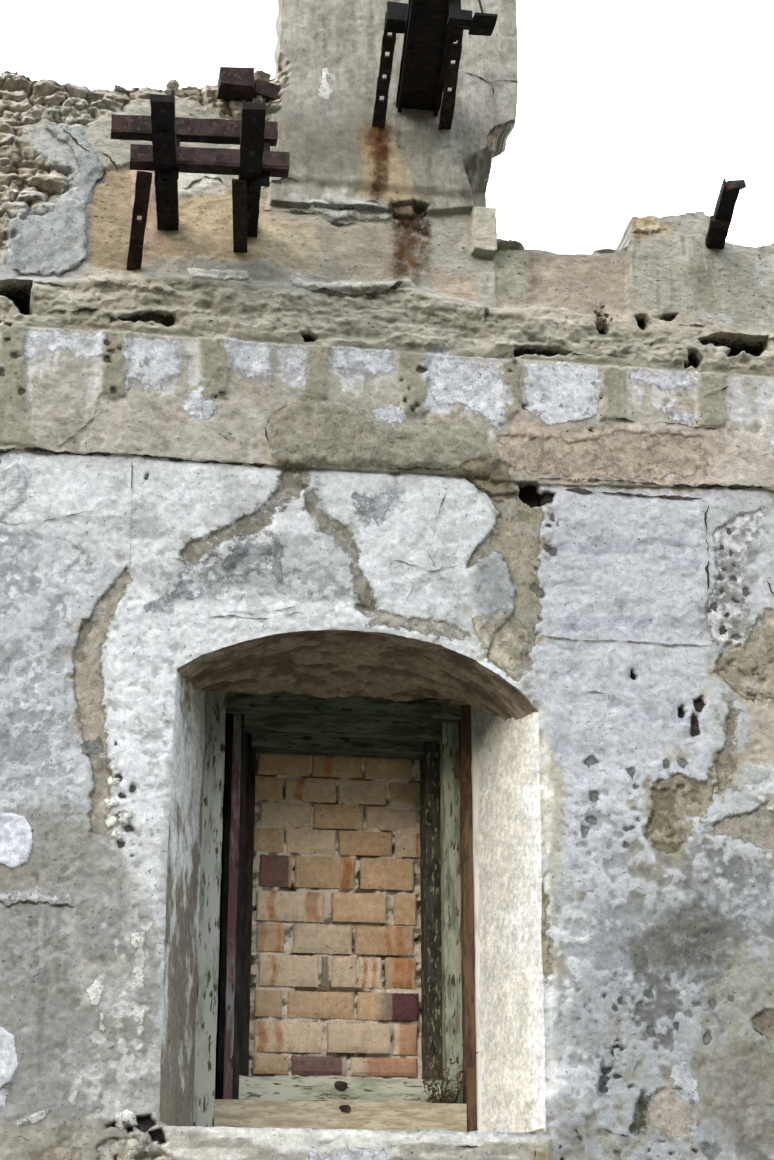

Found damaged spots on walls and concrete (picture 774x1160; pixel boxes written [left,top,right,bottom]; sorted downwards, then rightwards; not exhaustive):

corrosion [365,127,388,196]
spalling [7,123,106,277]
spalling [86,271,174,294]
corrosion [389,208,428,283]
crack [0,396,269,551]
crack [387,466,458,600]
spalling [144,336,768,681]
crack [543,635,712,646]
spalling [623,505,774,855]
spalling [584,755,599,767]
crack [0,850,91,908]
spalling [97,1109,175,1160]